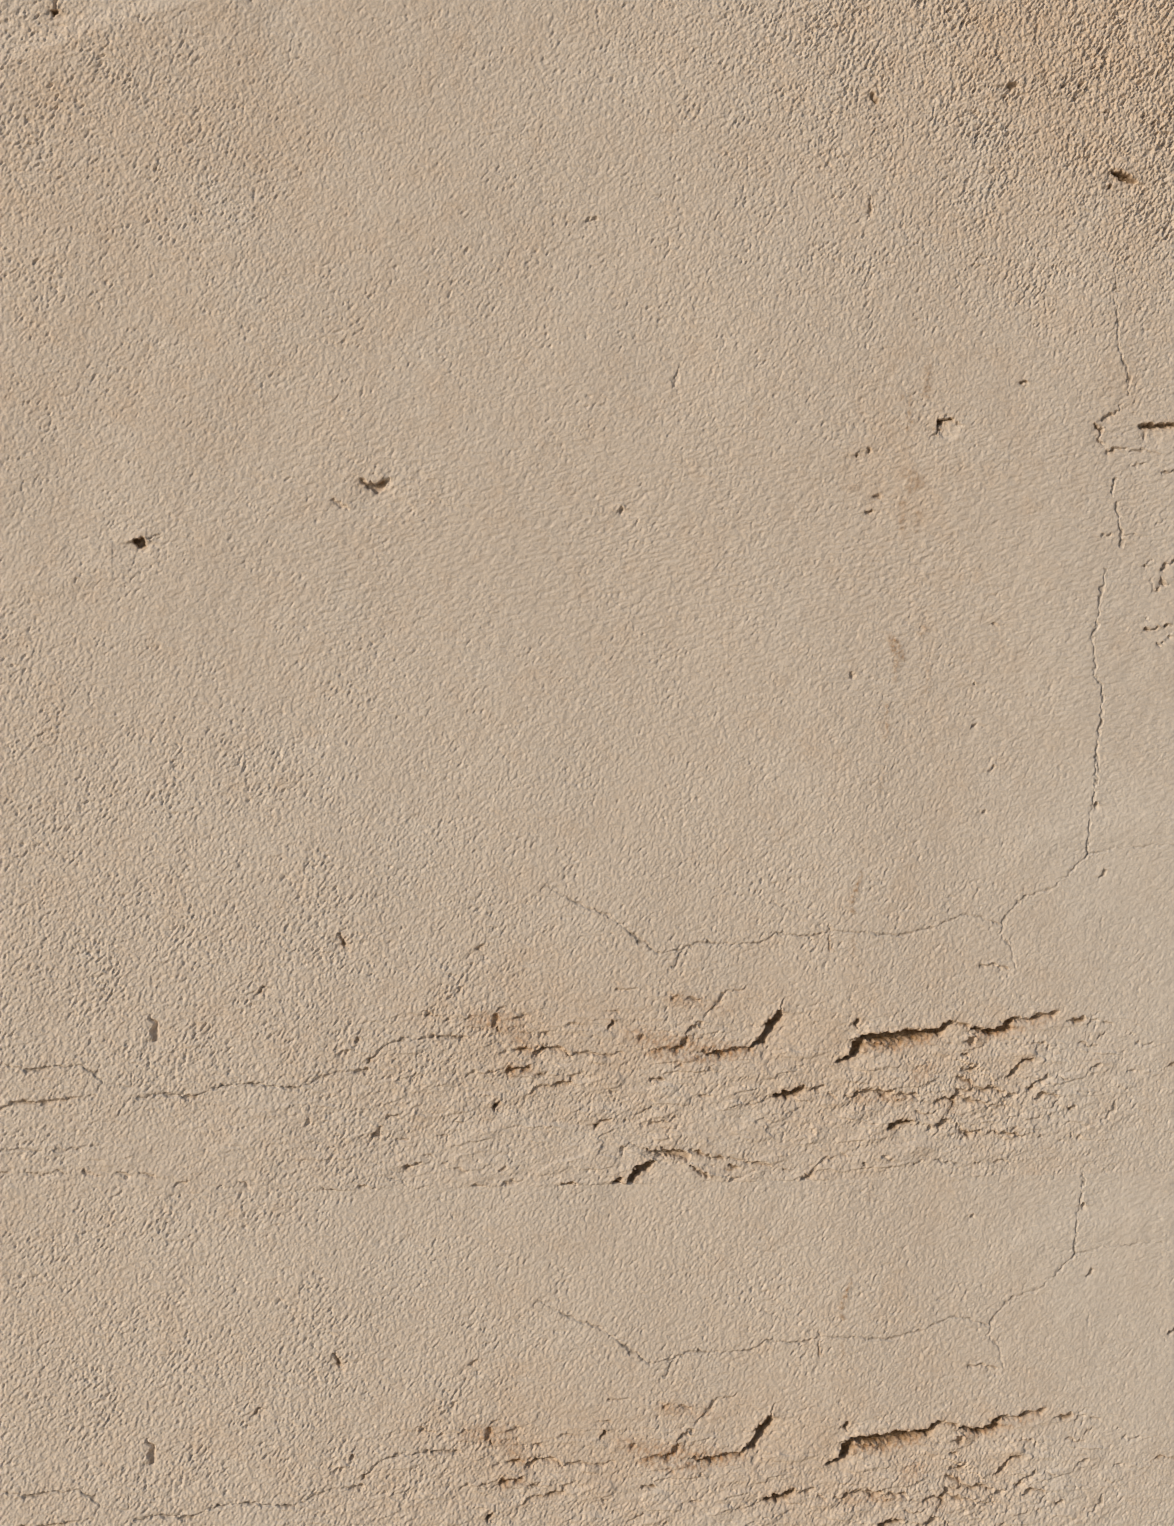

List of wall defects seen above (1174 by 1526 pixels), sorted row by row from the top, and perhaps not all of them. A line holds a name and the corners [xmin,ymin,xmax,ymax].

crack [515,258,1174,970]
crack [0,1031,470,1112]
crack [0,1446,463,1526]